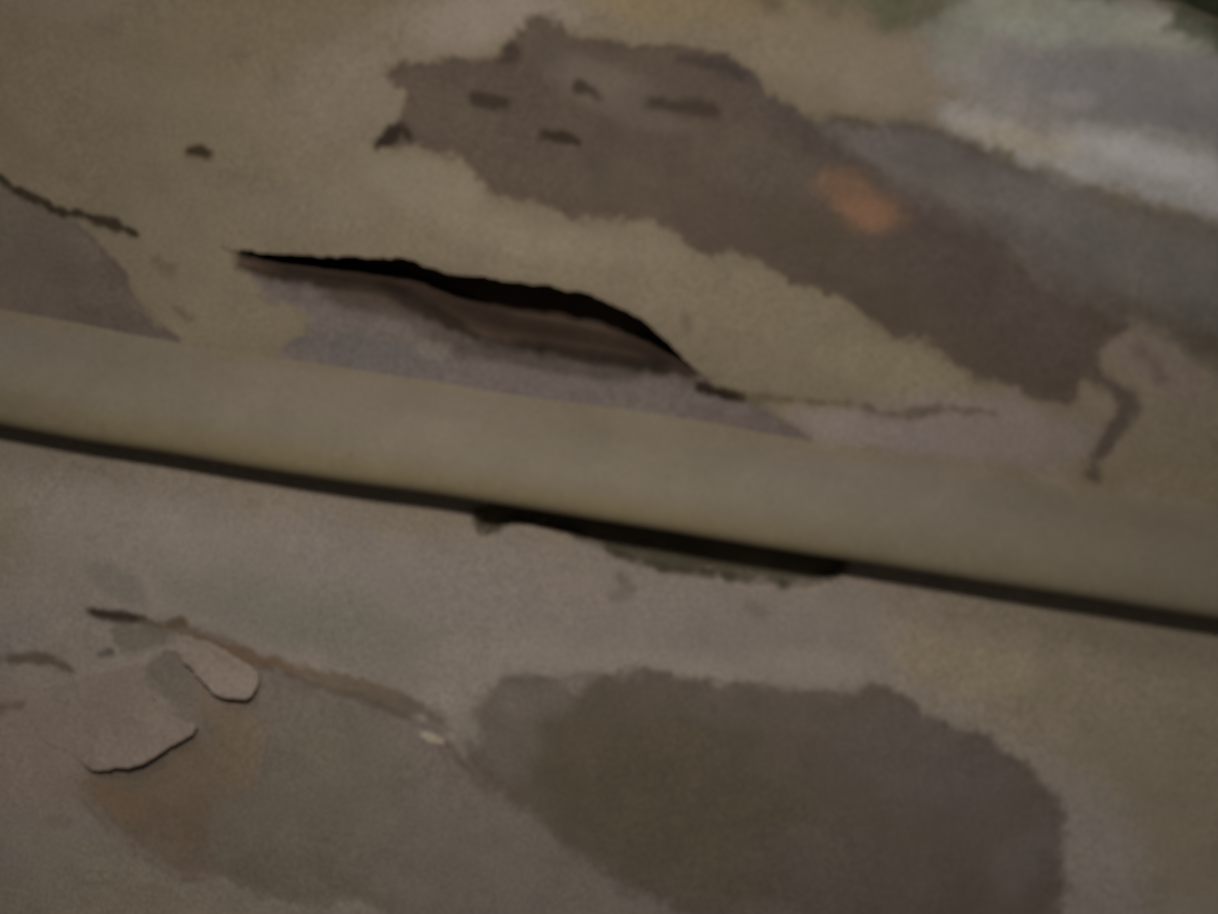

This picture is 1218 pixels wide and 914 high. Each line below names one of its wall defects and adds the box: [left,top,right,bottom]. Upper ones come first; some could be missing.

peeling [0,189,201,344]
spalling [221,6,1130,446]
water stain [807,0,1218,395]
peeling [0,449,1181,914]
water stain [463,655,1078,914]